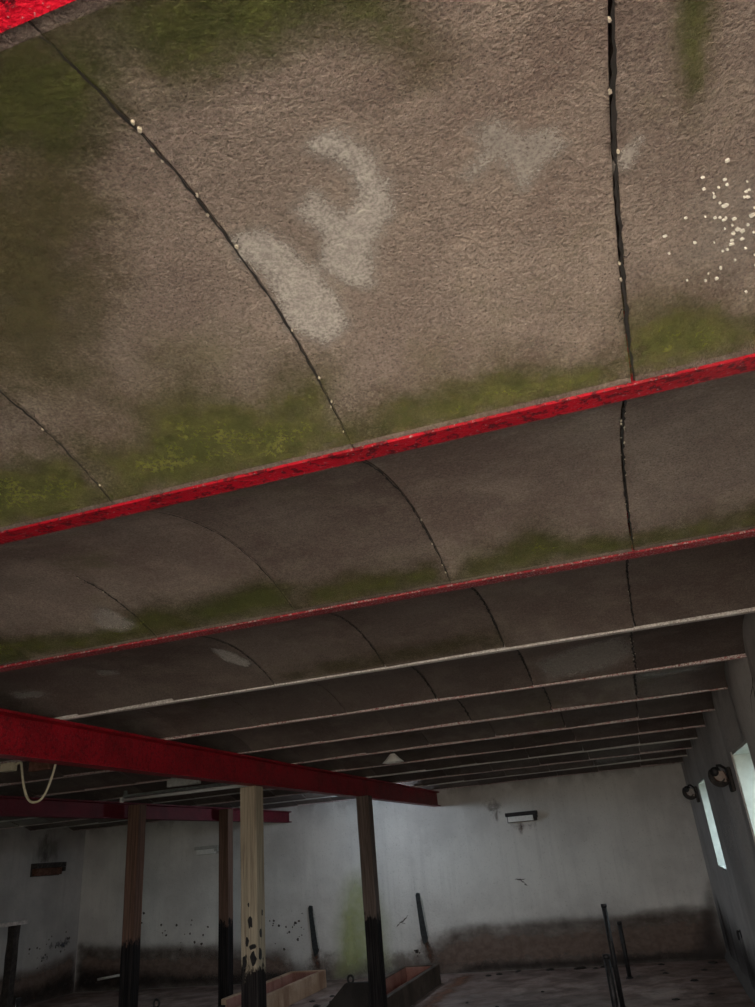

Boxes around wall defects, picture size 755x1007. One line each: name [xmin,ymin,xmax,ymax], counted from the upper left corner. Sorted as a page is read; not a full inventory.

leakage [231,131,392,344]
crack [40,37,552,710]
crack [608,0,639,698]
leakage [212,648,251,667]
crack [410,666,471,720]
leakage [393,910,755,979]